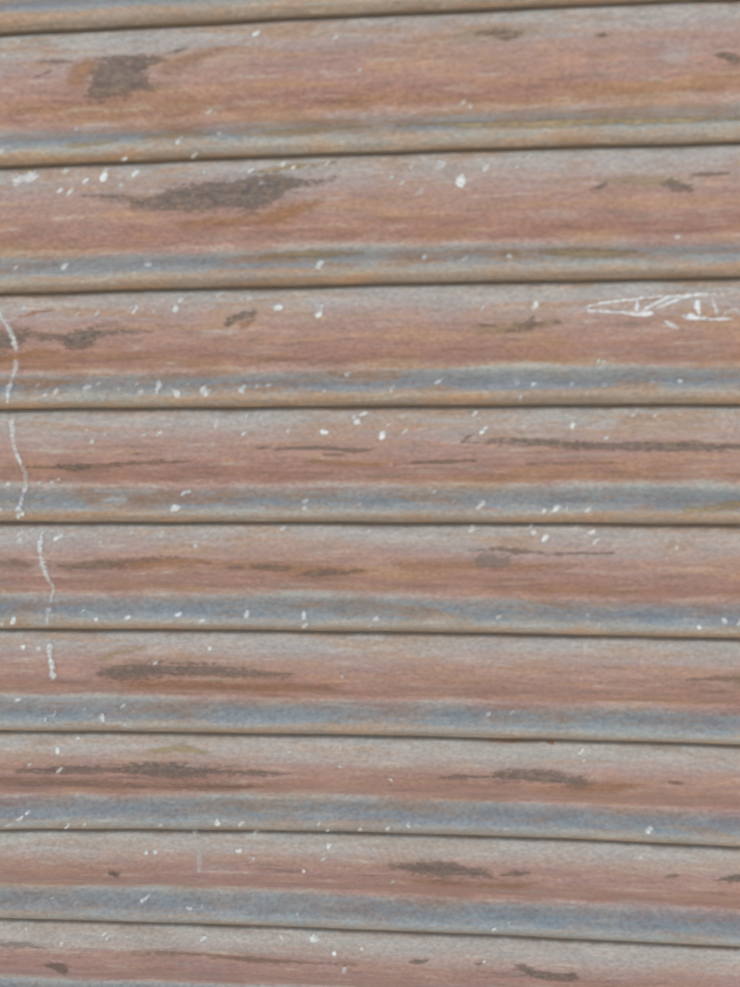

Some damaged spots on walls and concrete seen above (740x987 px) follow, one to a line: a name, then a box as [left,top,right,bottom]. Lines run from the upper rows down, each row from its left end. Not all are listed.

corrosion [37,52,166,104]
corrosion [130,161,336,227]
corrosion [0,310,150,360]
corrosion [96,660,322,690]
corrosion [18,743,287,779]
corrosion [440,769,594,789]
corrosion [389,861,529,880]